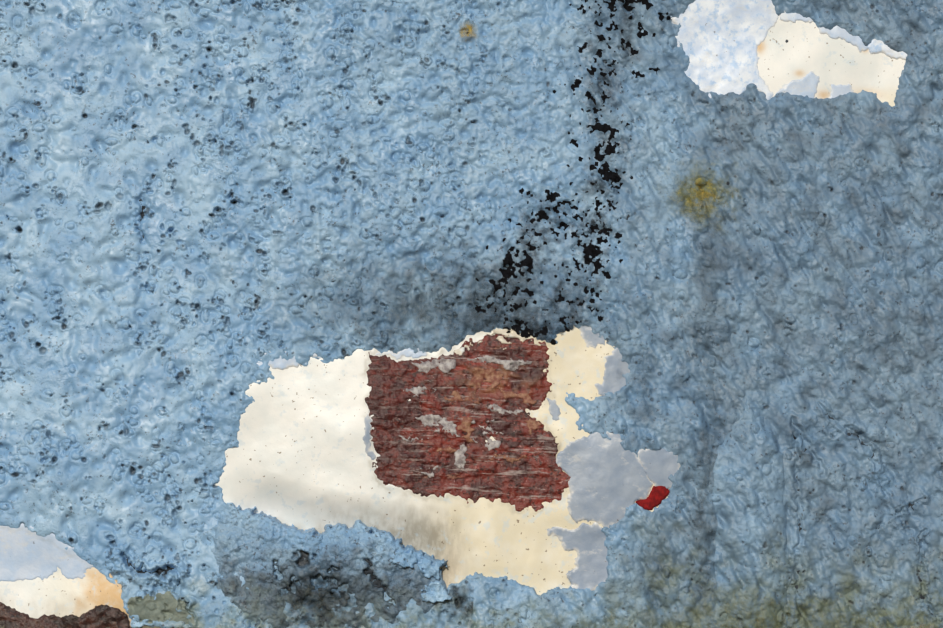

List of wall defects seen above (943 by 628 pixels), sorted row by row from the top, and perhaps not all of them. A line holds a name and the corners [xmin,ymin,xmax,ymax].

peeling [671,0,907,107]
peeling [215,326,680,595]
peeling [0,523,195,627]